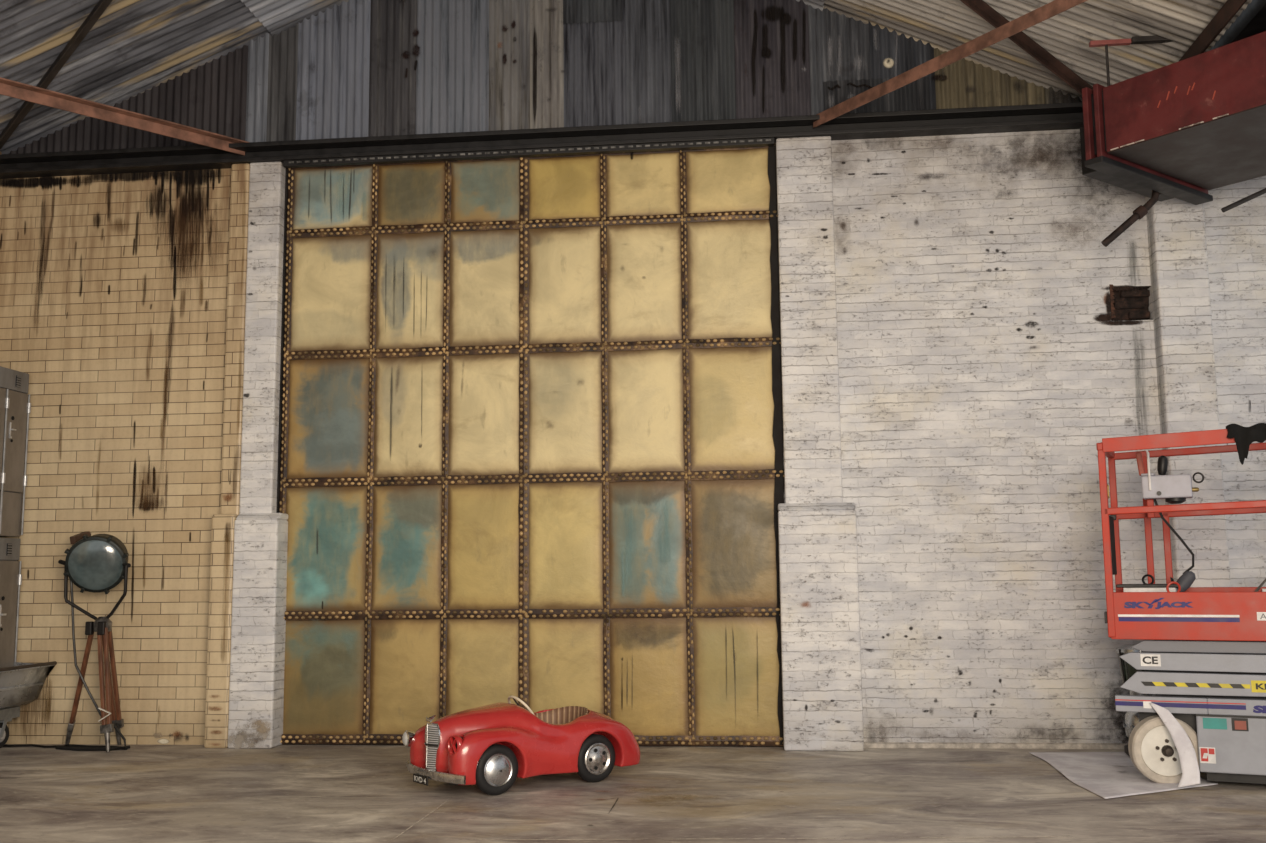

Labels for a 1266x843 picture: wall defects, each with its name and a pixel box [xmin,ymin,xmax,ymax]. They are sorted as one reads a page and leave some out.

water stain [39,196,54,287]
water stain [93,185,210,440]
water stain [132,458,167,516]